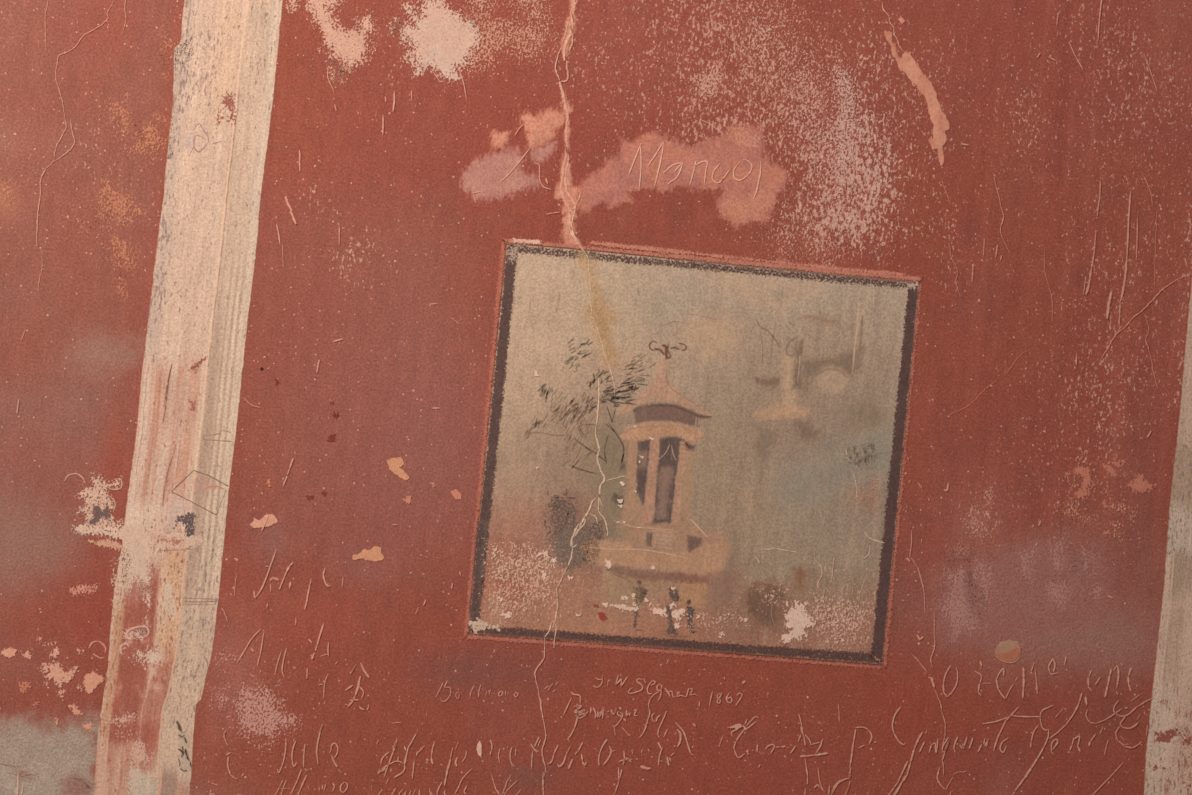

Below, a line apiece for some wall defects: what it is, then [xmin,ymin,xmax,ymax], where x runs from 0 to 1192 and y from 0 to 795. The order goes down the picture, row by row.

peeling [282,0,564,89]
peeling [460,129,557,201]
peeling [576,0,903,272]
crack [490,0,624,795]
peeling [387,457,409,480]
peeling [250,514,278,528]
peeling [352,546,384,562]
peeling [479,538,577,626]
peeling [602,587,749,638]
peeling [762,576,874,653]
flaking render [995,640,1021,663]